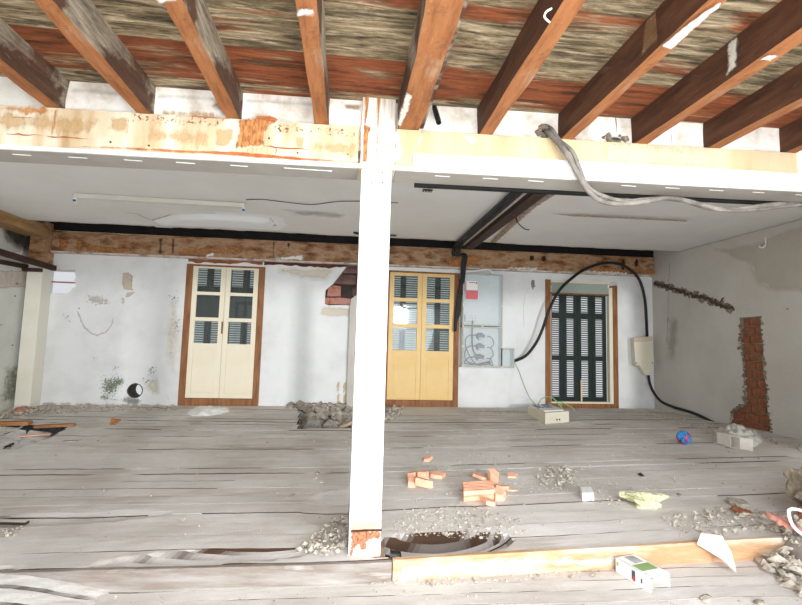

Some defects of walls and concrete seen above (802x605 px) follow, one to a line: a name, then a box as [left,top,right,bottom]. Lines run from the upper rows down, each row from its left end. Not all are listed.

rust [8,107,83,139]
rust [130,96,380,162]
peeling [0,271,27,288]
peeling [122,273,134,297]
spalling [188,252,358,317]
leakage [101,375,121,398]
spalling [729,316,773,433]
rust [348,510,382,555]